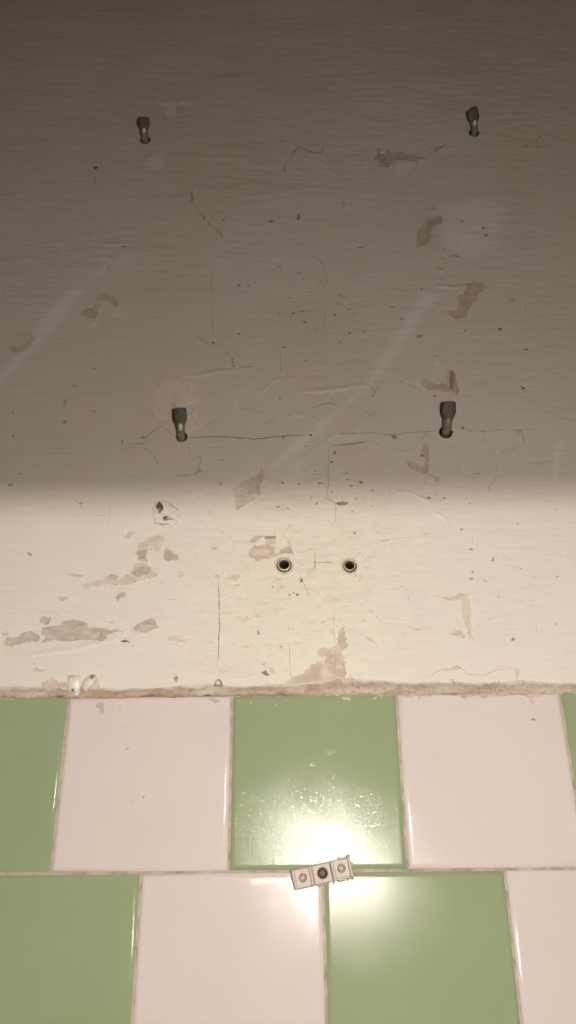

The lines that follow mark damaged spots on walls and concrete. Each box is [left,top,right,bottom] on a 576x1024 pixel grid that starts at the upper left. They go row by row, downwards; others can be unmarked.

peeling [448,281,484,319]
crack [122,397,433,476]
peeling [221,469,265,509]
peeling [84,501,181,601]
peeling [249,536,308,596]
peeling [2,616,158,648]
crack [215,584,223,673]
peeling [438,594,473,639]